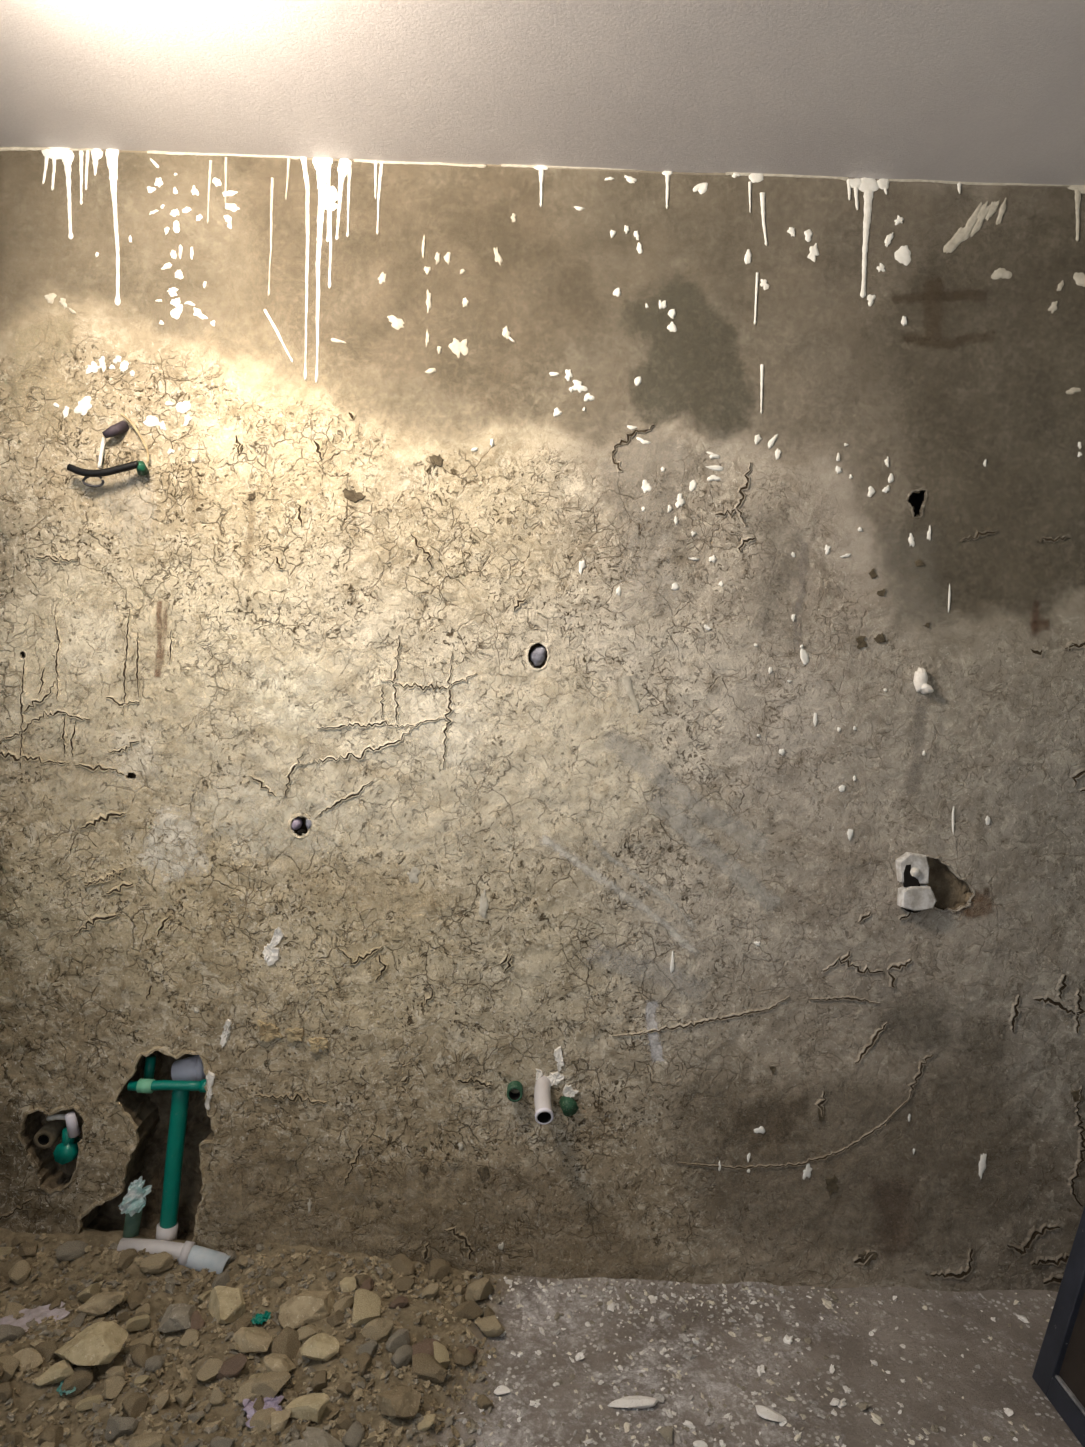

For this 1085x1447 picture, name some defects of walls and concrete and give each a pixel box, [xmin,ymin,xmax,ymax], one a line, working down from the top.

damp [0,147,1085,603]
crack [610,424,654,473]
crack [715,462,755,553]
crack [0,609,174,776]
crack [249,635,478,816]
flaking render [924,854,976,914]
flaking render [220,1019,232,1048]
crack [612,912,919,1064]
crack [1008,974,1085,1034]
spalling [17,1103,86,1195]
spalling [75,1046,218,1242]
crack [931,1085,1085,1286]